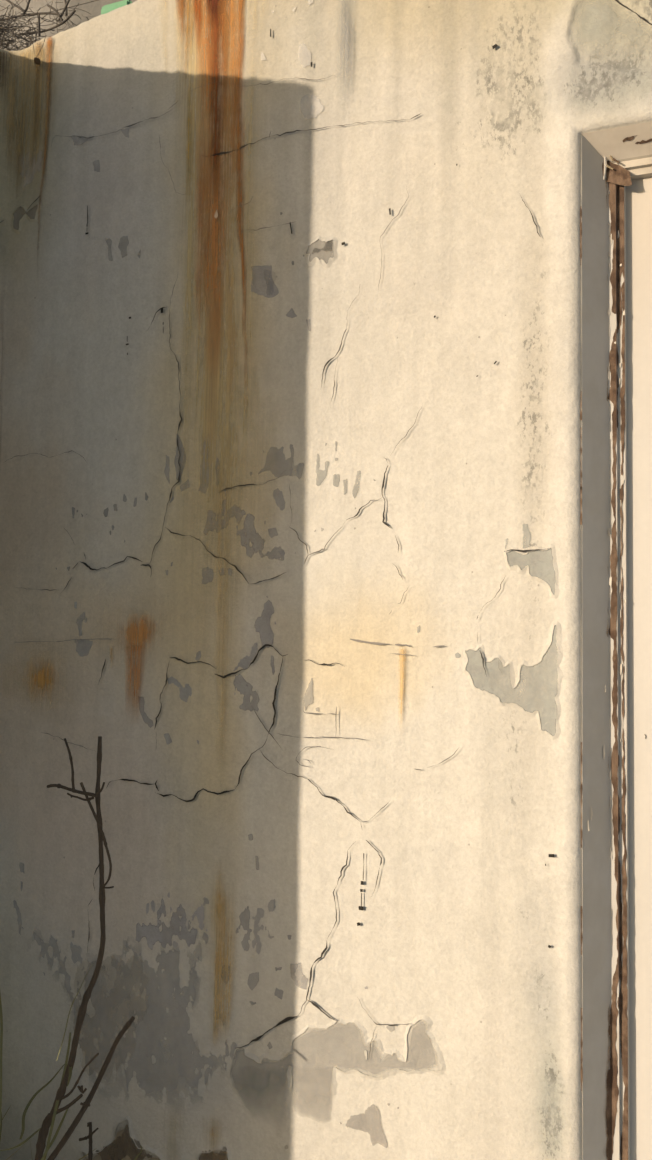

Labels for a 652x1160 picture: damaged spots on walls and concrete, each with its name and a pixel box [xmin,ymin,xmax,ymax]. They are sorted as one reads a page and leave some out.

corrosion [180,0,245,486]
crack [321,185,409,406]
crack [16,276,422,613]
peeling [250,441,359,510]
peeling [504,524,560,599]
peeling [455,621,563,740]
corrosion [602,155,632,1160]
crack [106,644,388,1048]
corrosion [581,742,593,848]
peeling [227,1014,446,1095]
crack [357,997,411,1054]
peeling [340,1103,399,1148]